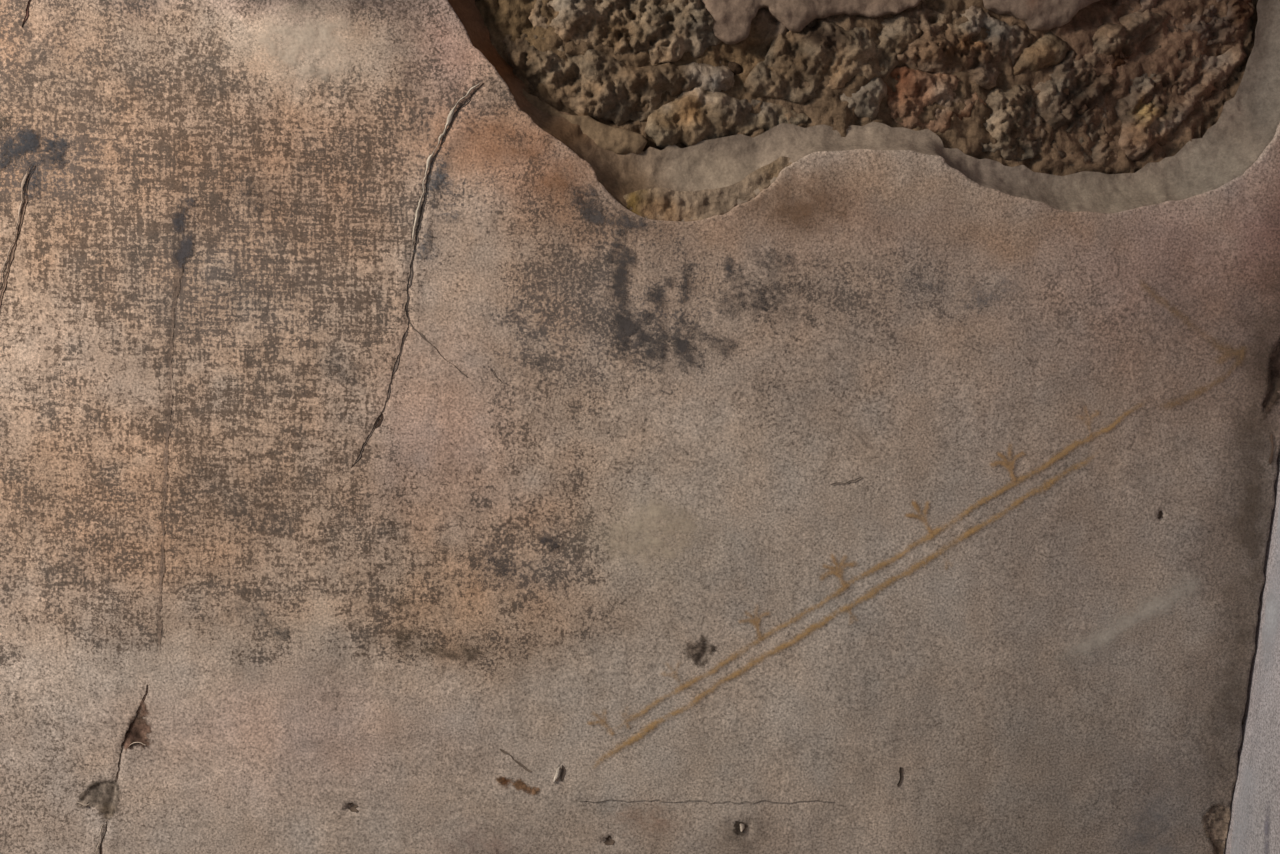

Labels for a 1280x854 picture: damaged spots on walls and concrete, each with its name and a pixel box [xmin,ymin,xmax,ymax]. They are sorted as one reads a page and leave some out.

spalling [448,0,1280,222]
crack [0,164,36,305]
crack [352,83,510,466]
crack [97,686,147,854]